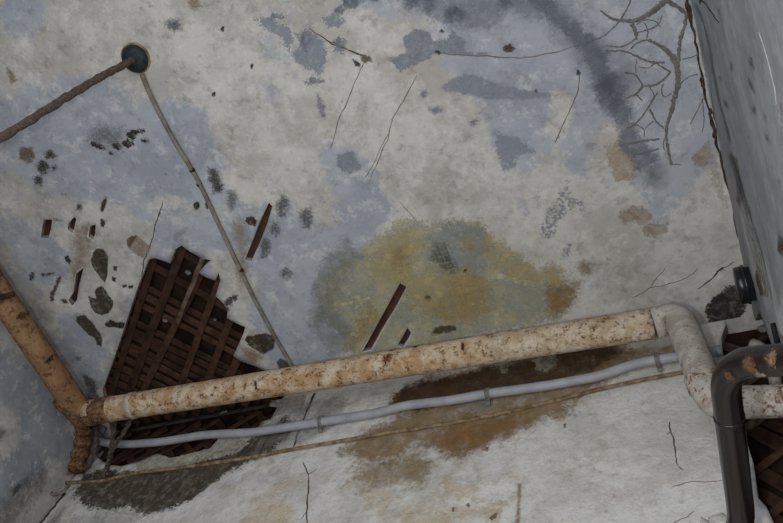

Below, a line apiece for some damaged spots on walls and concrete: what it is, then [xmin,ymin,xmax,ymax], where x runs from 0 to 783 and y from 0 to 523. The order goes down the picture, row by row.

crack [685,0,729,192]
flaking render [65,226,134,346]
flaking render [127,235,151,258]
damp [316,217,577,355]
crack [635,215,741,297]
damp [728,154,771,301]
flaking render [245,333,275,362]
damp [72,395,306,518]
crack [293,393,316,447]
crack [302,463,315,523]
crack [667,422,722,487]